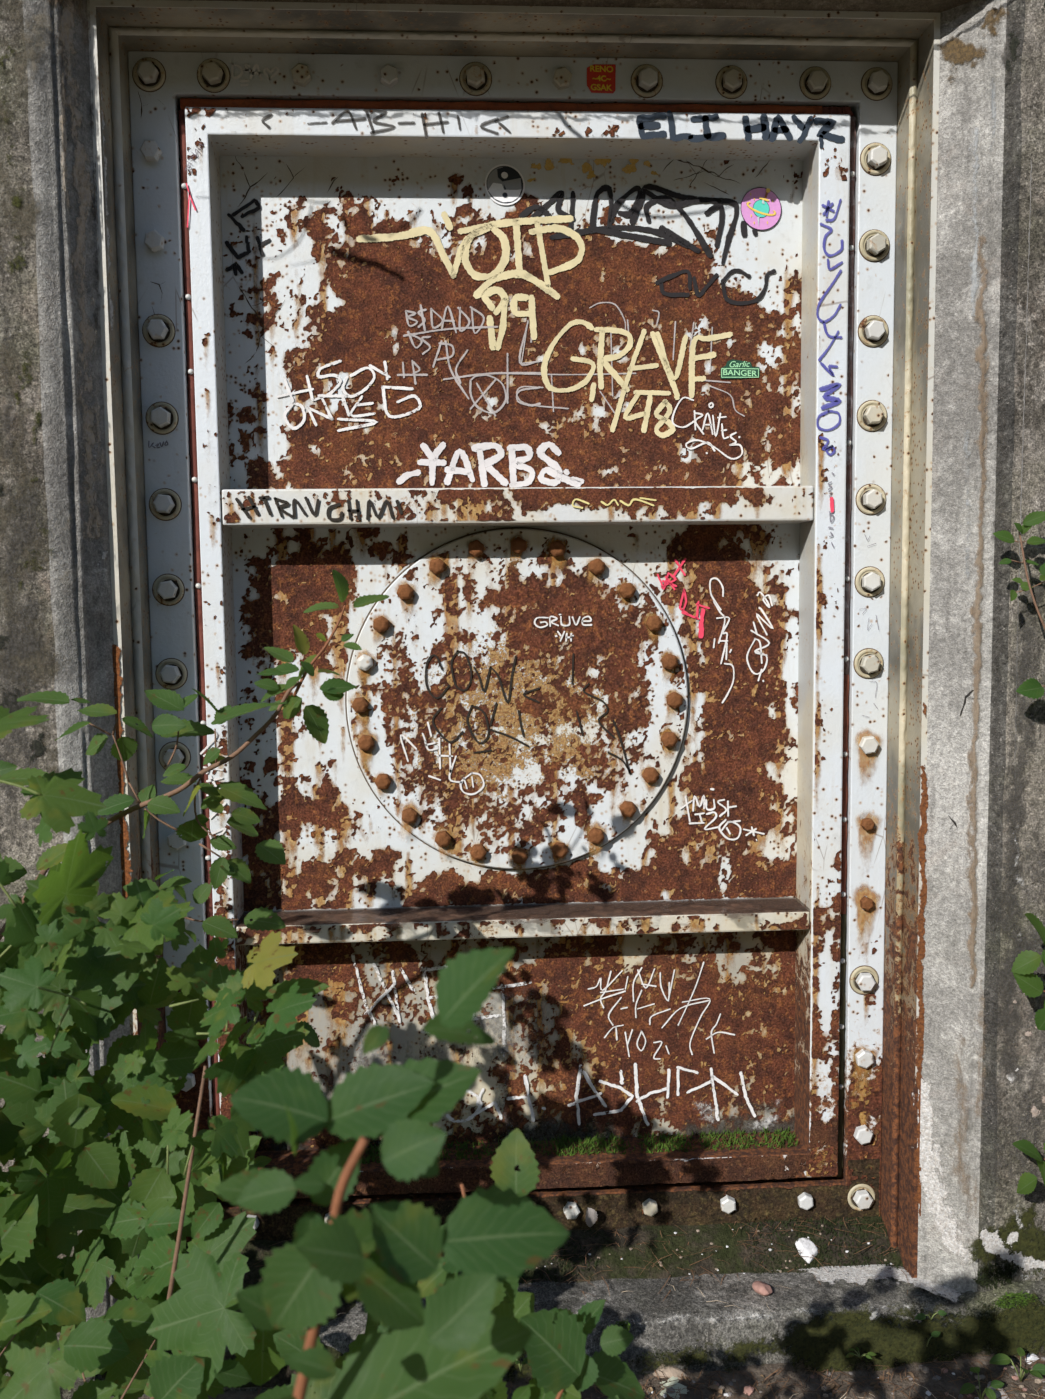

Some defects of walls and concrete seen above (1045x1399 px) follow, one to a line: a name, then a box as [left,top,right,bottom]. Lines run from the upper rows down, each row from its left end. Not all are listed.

damp [991,402,1006,547]
corrosion [173,173,885,1230]
corrosion [223,1168,495,1241]
corrosion [914,765,928,1216]
damp [912,581,1045,1280]